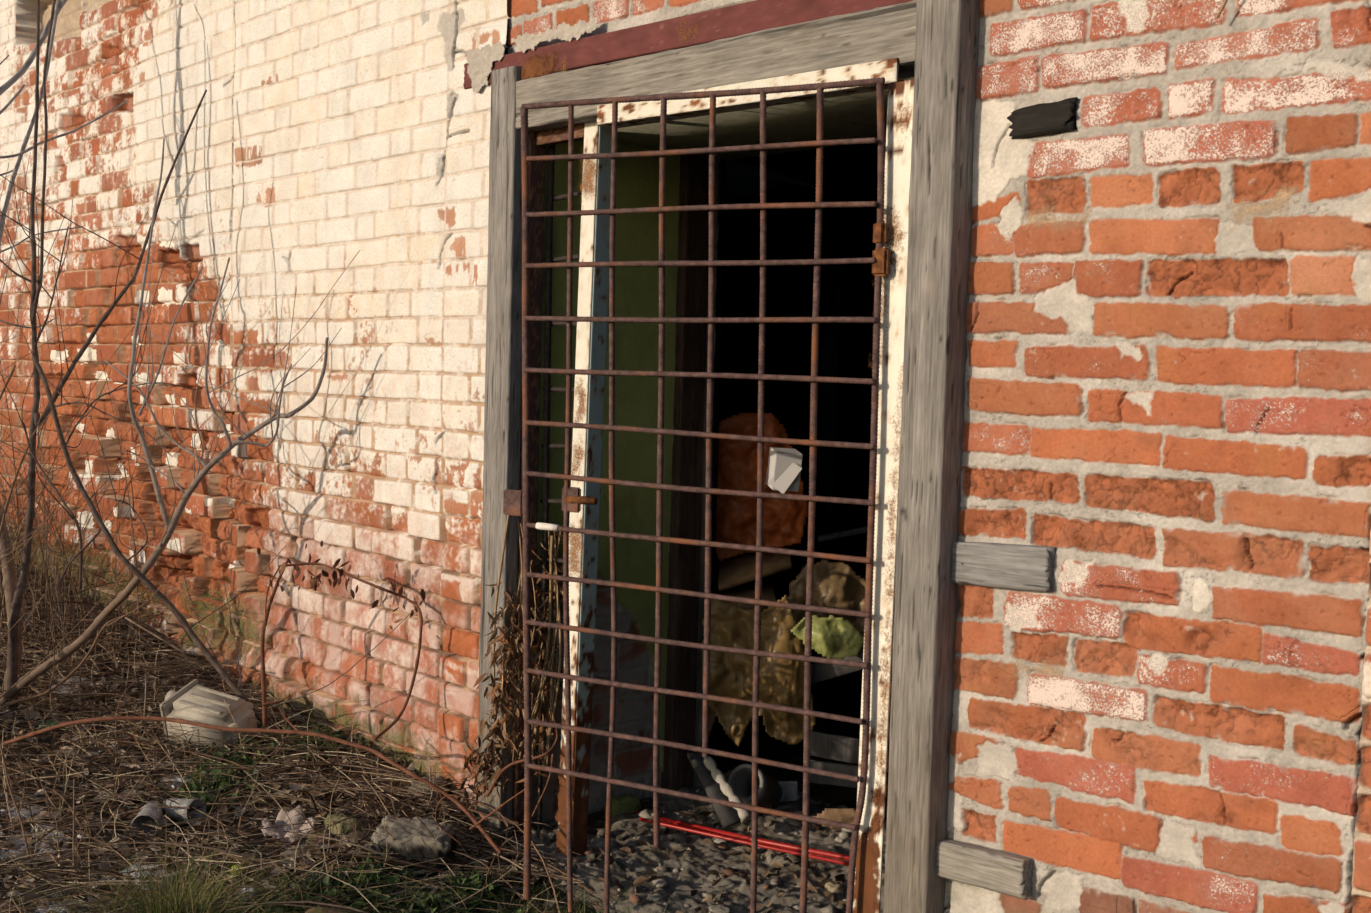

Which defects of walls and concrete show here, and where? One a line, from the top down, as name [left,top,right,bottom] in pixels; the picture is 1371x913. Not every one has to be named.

crack [435,0,472,189]
rust [580,148,596,193]
spalling [1024,173,1088,218]
spalling [1156,159,1309,210]
crack [437,229,456,272]
spalling [1144,255,1292,301]
spalling [0,0,482,777]
rust [575,384,586,423]
crack [1252,403,1274,438]
crack [432,428,446,497]
rust [888,420,900,596]
rust [853,621,892,913]